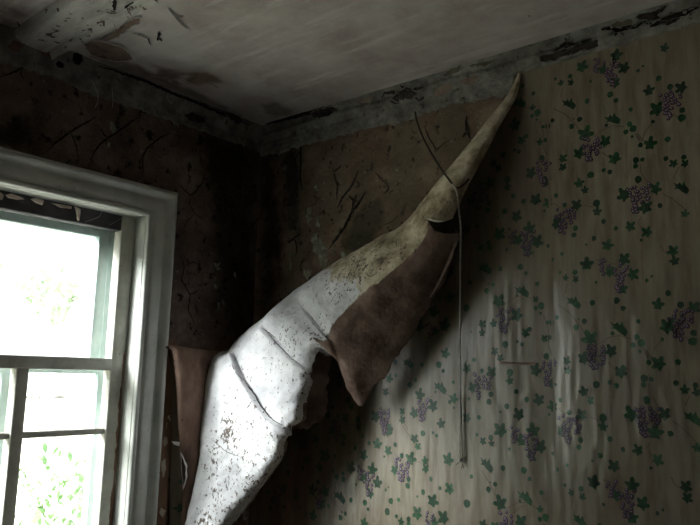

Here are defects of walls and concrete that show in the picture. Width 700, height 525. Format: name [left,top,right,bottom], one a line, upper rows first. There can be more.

spalling [70,17,142,68]
crack [46,115,170,178]
crack [328,165,390,250]